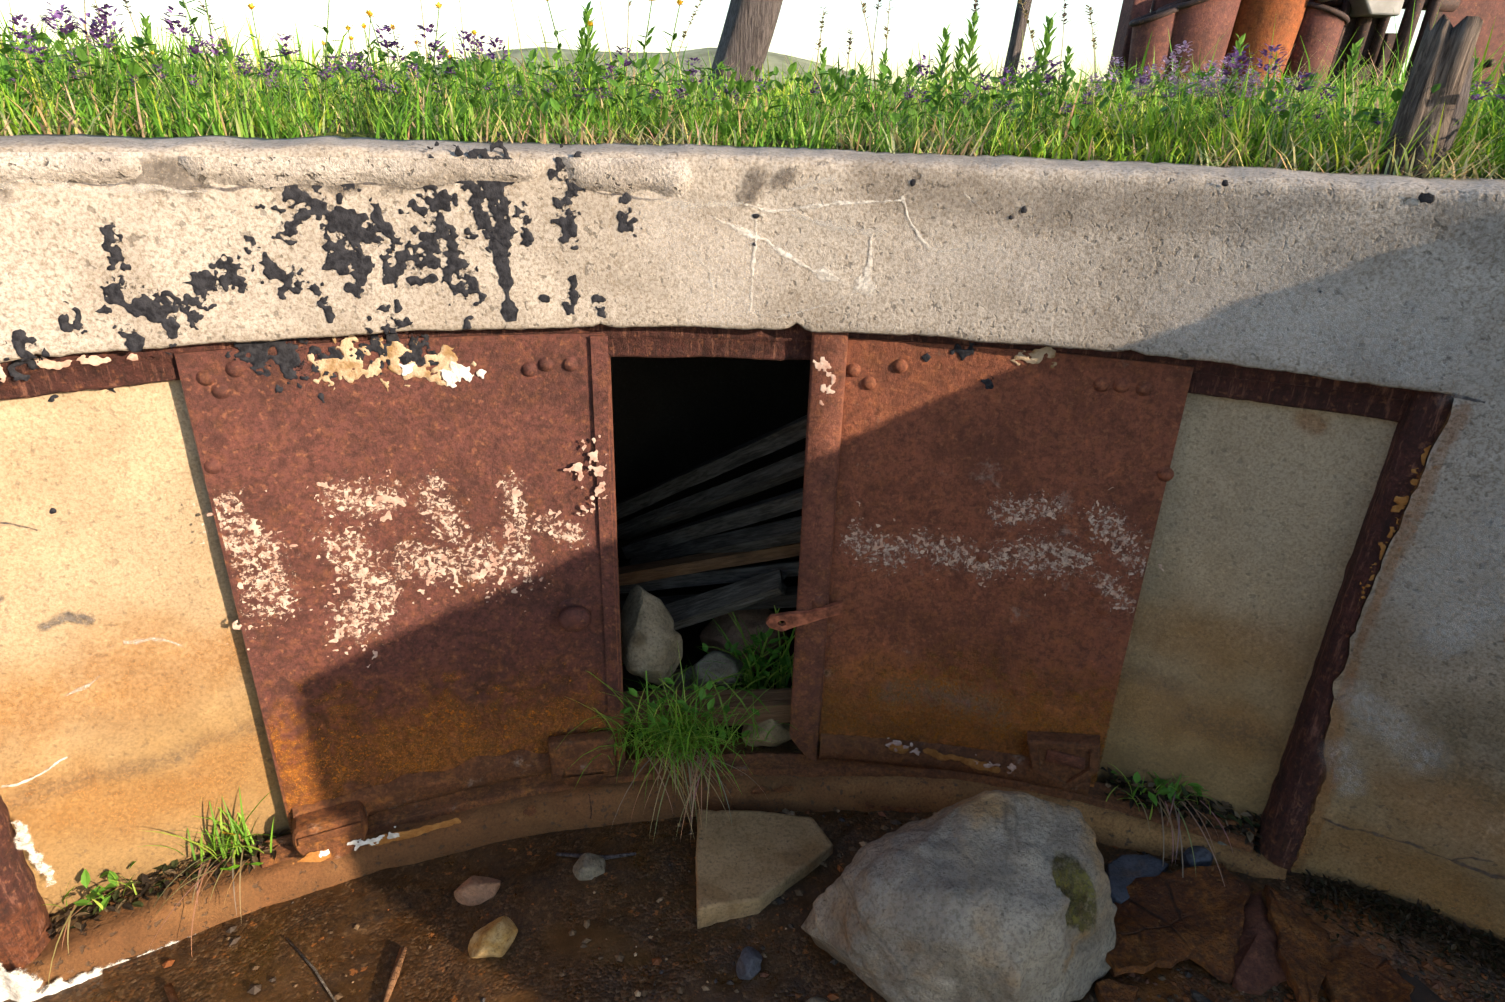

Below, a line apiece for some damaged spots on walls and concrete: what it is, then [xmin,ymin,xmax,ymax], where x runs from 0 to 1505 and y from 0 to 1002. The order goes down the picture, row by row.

peeling [427,131,528,160]
spalling [130,158,209,198]
peeling [548,144,586,250]
peeling [539,275,606,318]
peeling [193,435,608,668]
spalling [39,612,94,630]
efflorescence [14,821,55,883]
spalling [293,850,331,864]
spalling [368,818,461,846]
efflorescence [0,941,178,1002]